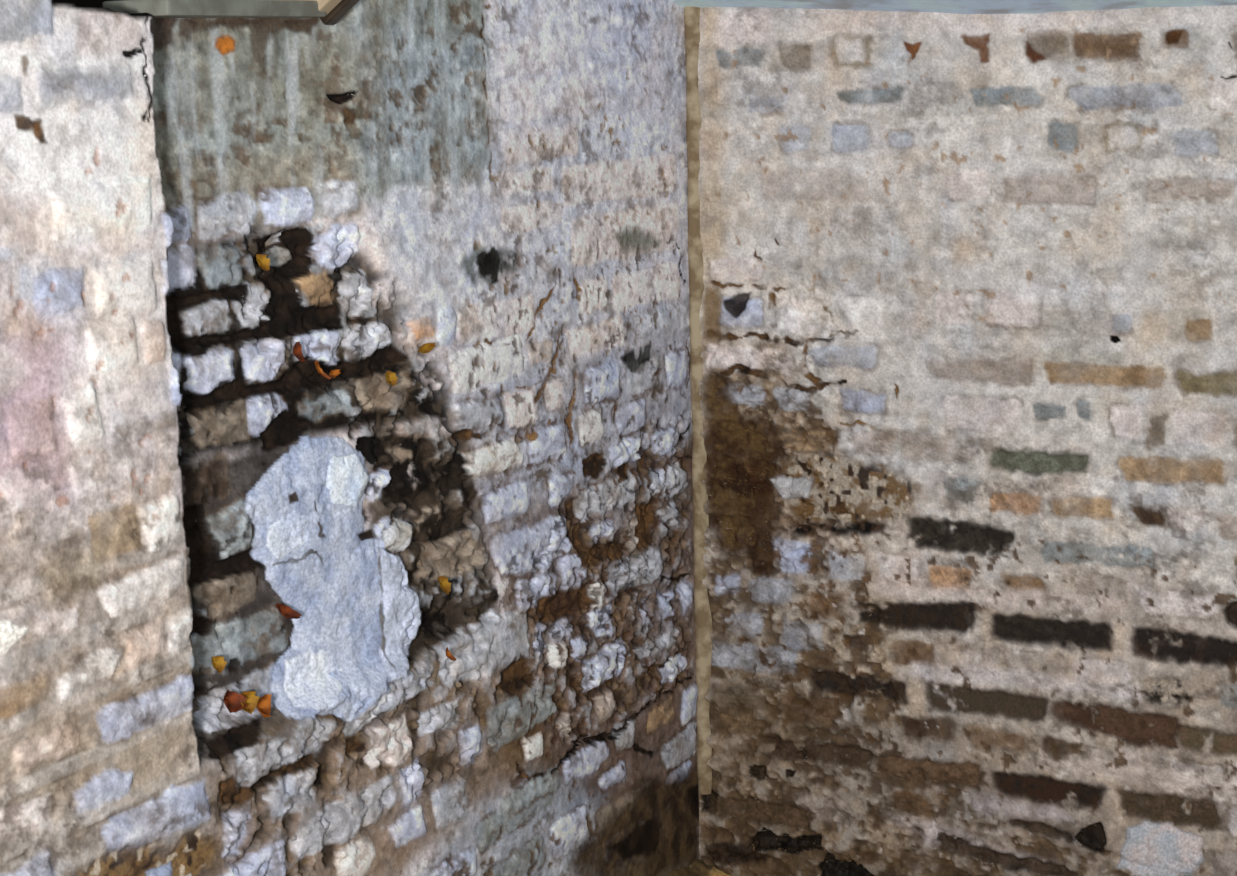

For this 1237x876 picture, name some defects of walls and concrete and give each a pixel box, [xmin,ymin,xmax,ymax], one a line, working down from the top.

spalling [166,228,343,351]
damp [705,290,720,337]
spalling [181,346,407,410]
spalling [260,409,311,450]
damp [703,375,783,575]
spalling [183,504,261,636]
spalling [356,434,499,659]
crack [660,573,688,583]
spalling [205,719,260,759]
crack [516,641,692,781]
spalling [219,754,321,805]
spalling [77,832,214,876]